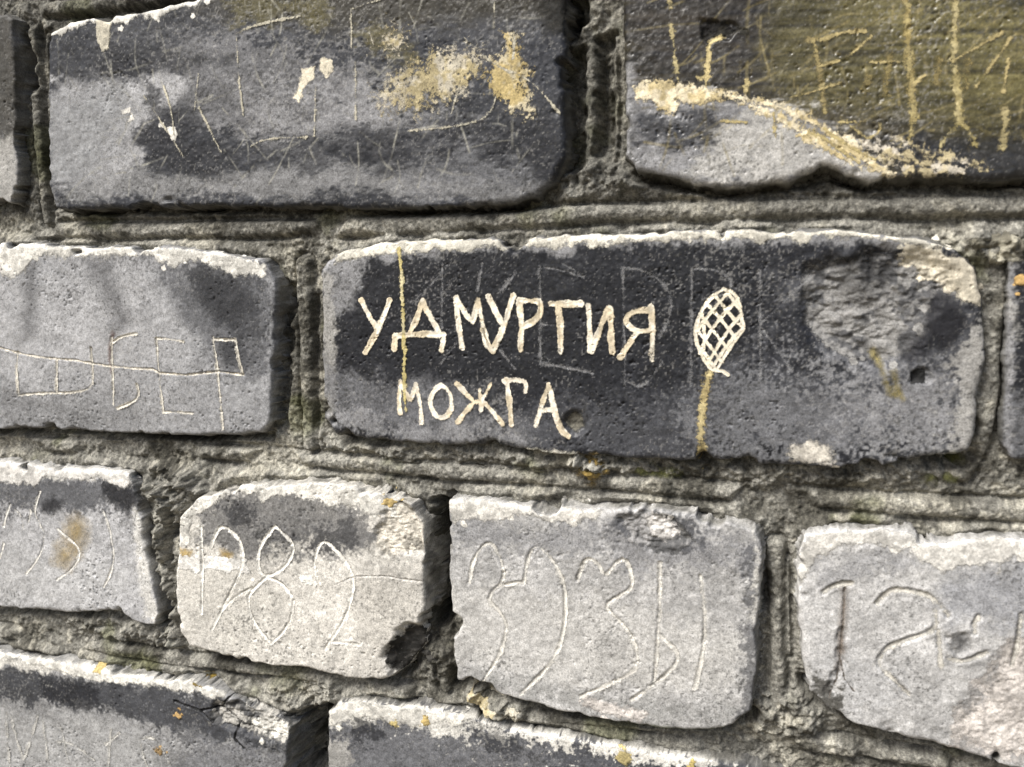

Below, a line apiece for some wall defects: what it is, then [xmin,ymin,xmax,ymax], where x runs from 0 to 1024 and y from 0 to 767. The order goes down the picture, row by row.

peeling [367,13,536,123]
peeling [632,79,993,179]
crack [173,692,269,749]